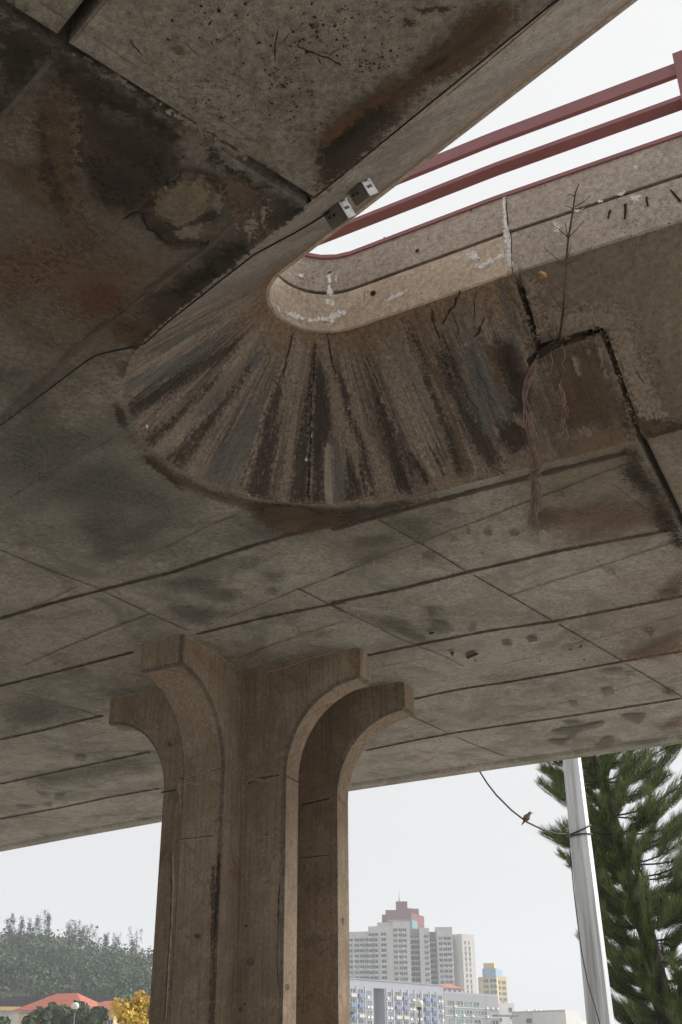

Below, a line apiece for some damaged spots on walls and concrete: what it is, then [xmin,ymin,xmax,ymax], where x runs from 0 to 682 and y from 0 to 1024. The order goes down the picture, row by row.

water stain [0,0,193,258]
water stain [167,0,520,195]
water stain [111,146,682,550]
crack [412,290,496,430]